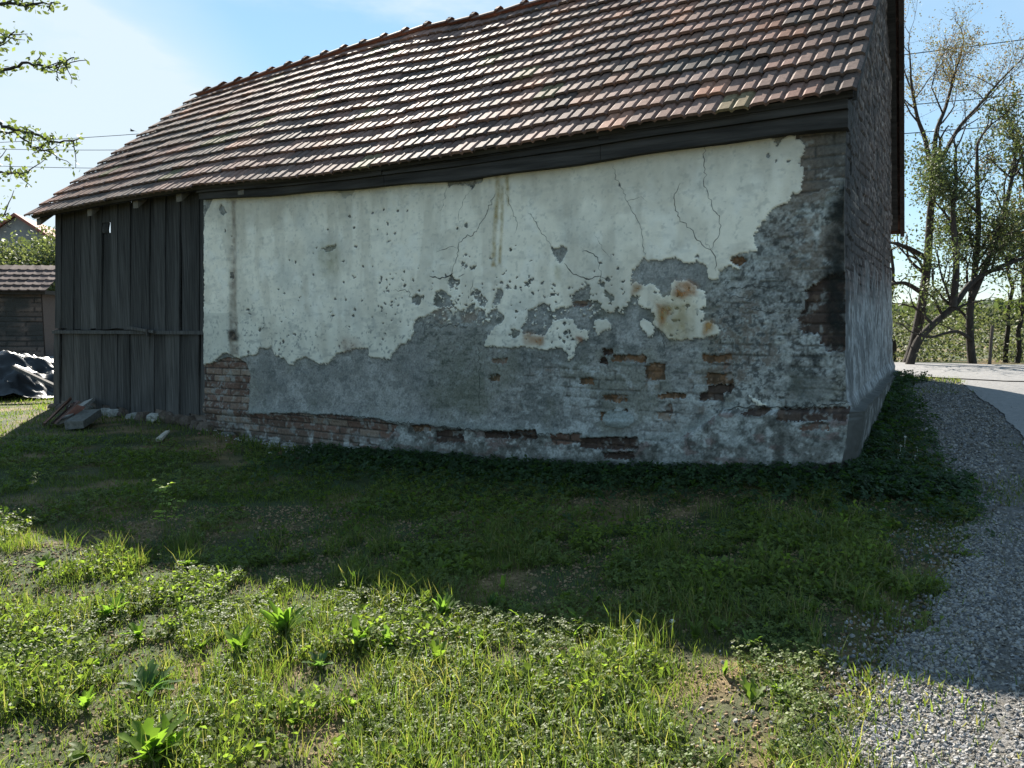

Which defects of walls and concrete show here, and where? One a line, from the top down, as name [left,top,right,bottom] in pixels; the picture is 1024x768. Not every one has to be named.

crack [395,188,606,297]
peeling [202,131,899,473]